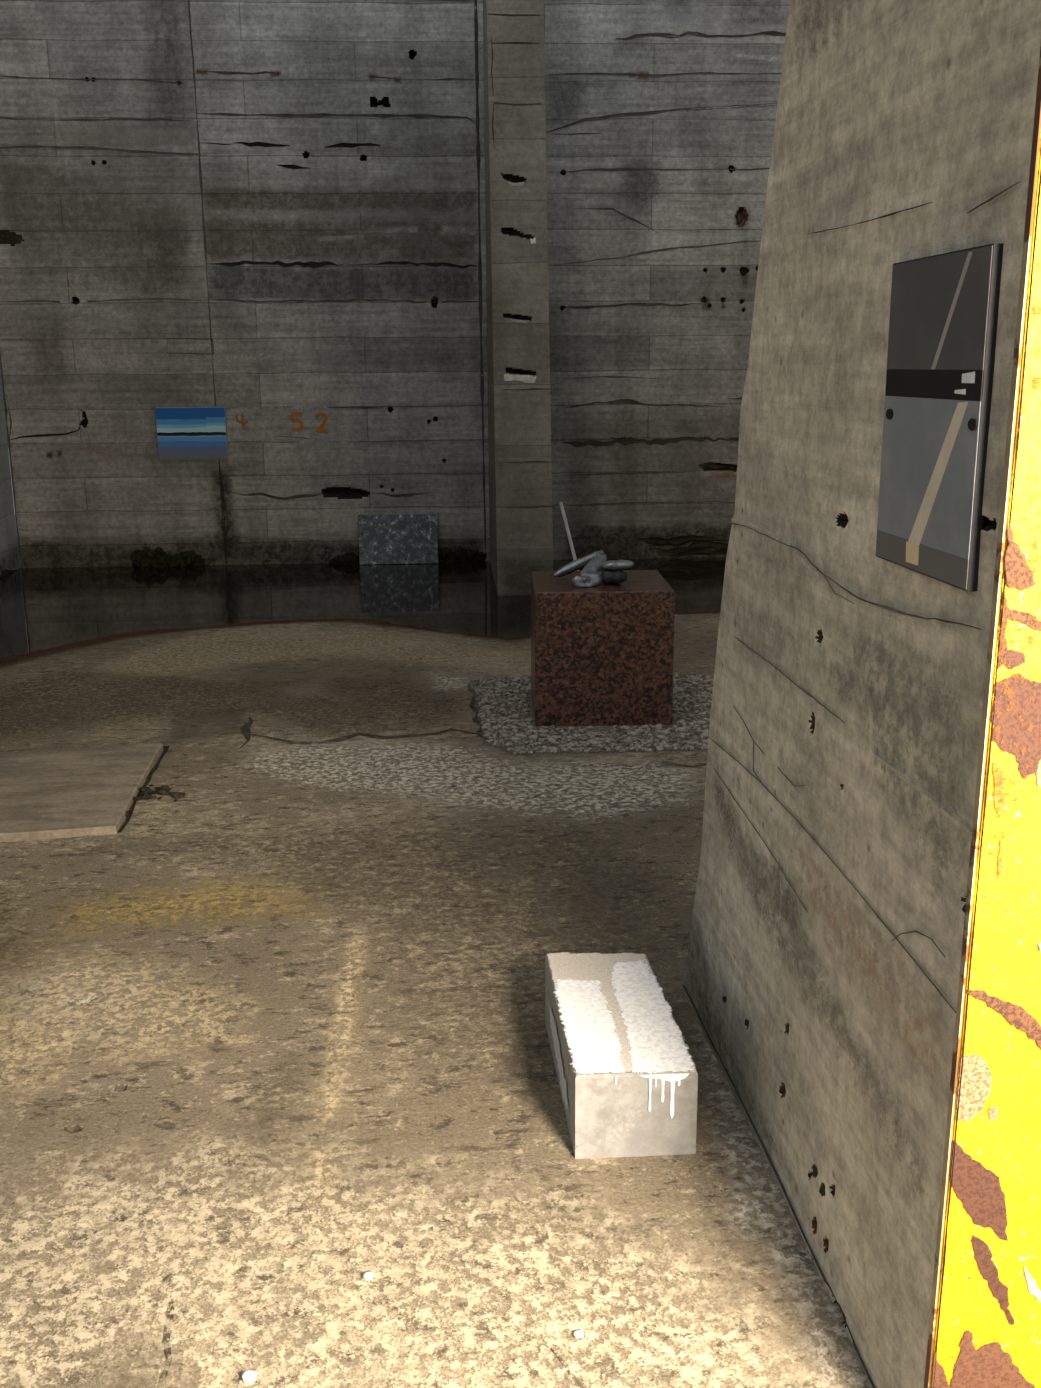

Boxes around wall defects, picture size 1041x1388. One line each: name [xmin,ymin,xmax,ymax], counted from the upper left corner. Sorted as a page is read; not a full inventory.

damp [0,462,359,578]
crack [503,169,1041,1388]
corrosion [924,46,1041,1388]